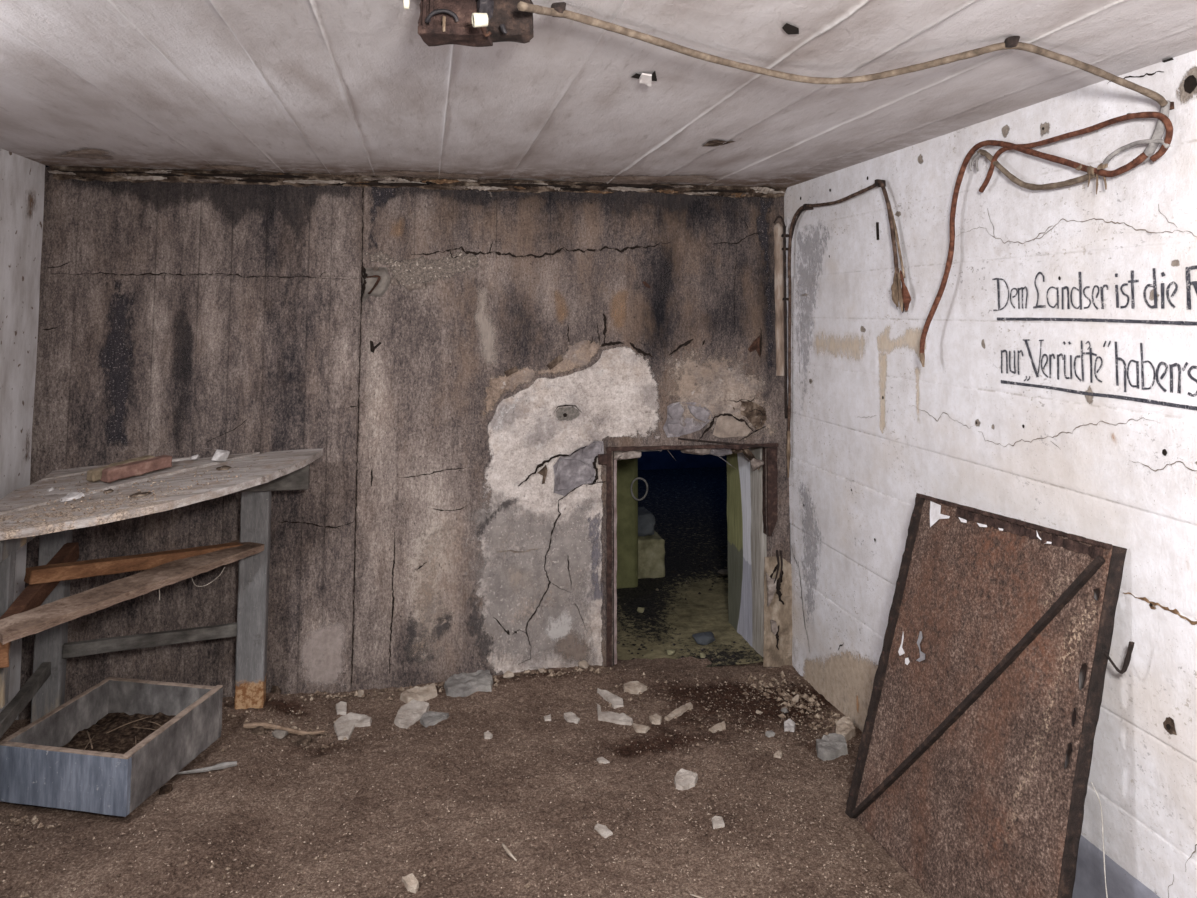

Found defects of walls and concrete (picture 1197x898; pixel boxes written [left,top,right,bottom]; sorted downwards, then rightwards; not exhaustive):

crack [411,242,670,258]
crack [967,204,1196,244]
water stain [816,327,926,433]
flaking render [467,334,775,674]
crack [493,481,606,665]
crack [1124,592,1197,625]
water stain [803,651,878,732]